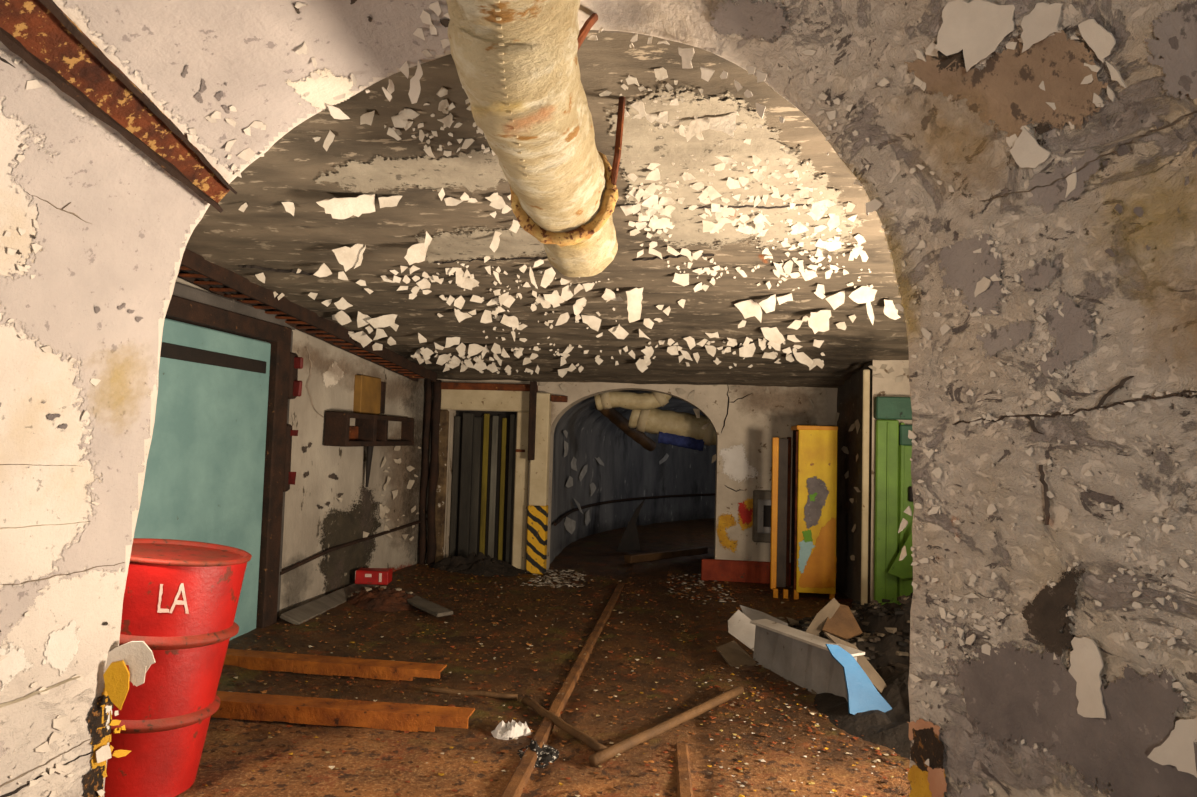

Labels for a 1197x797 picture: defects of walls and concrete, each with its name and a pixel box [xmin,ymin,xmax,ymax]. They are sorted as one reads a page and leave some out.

crack [0,739,97,797]
peeling [0,48,205,661]
peeling [62,0,1127,406]
crack [1039,465,1050,525]
peeling [898,430,1197,797]
crack [952,376,1197,434]